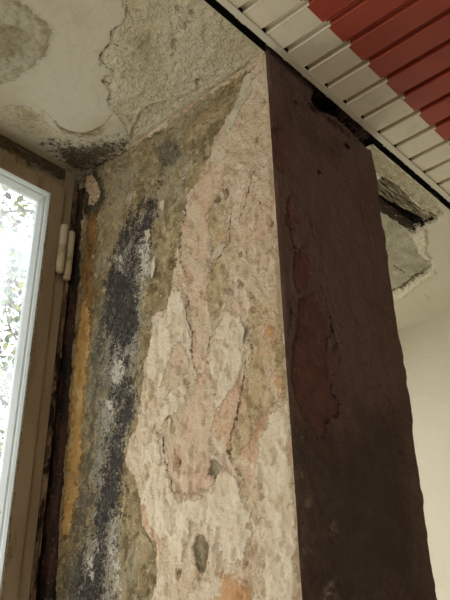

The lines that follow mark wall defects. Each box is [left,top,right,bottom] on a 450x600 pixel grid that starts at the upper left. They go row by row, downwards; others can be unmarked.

leakage [0,125,126,220]
crack [210,171,263,274]
spalling [305,88,444,300]
leakage [59,181,167,600]
peeling [0,0,338,600]
crack [185,301,210,375]
crack [226,331,253,480]